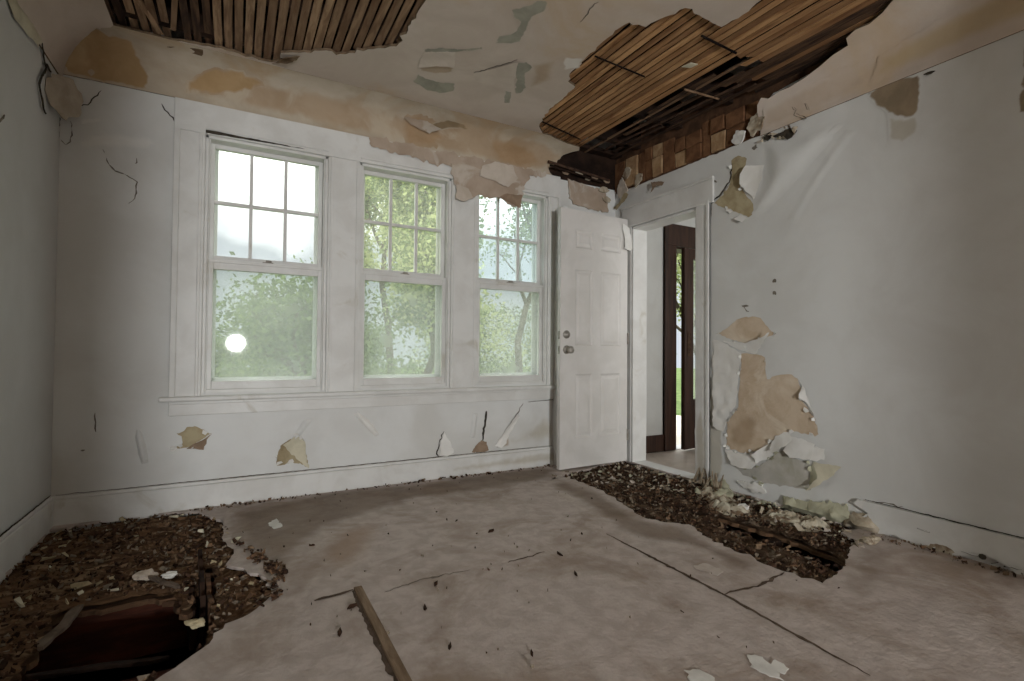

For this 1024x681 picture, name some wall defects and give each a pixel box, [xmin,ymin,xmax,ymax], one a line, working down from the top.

crack [38,43,52,114]
leakage [63,28,150,91]
peeling [412,0,550,93]
peeling [504,56,583,103]
leakage [761,0,1024,143]
leakage [182,67,563,178]
flaking render [614,45,827,222]
flaking render [451,161,533,209]
spalling [170,426,211,451]
spalling [276,433,309,468]
spalling [472,404,523,453]
flaking render [709,305,884,535]